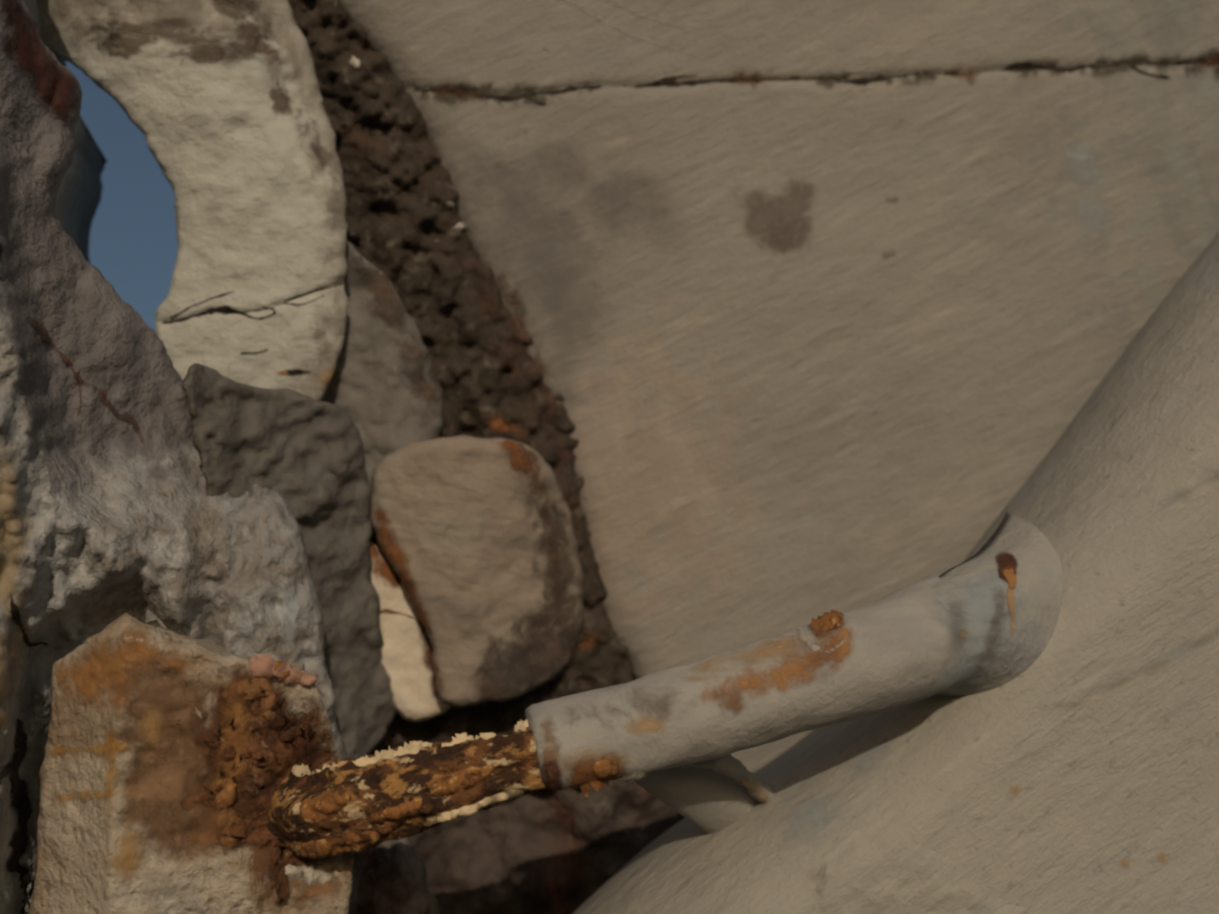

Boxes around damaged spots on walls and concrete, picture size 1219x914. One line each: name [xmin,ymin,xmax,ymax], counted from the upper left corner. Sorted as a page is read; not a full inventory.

rust [0,0,78,119]
crack [413,58,1219,105]
damp [746,185,811,250]
crack [161,284,343,324]
rust [490,418,538,478]
crack [10,595,48,647]
rust [369,508,440,697]
rust [710,609,850,711]
rust [996,552,1017,630]
rust [51,631,645,905]
crack [0,719,34,914]